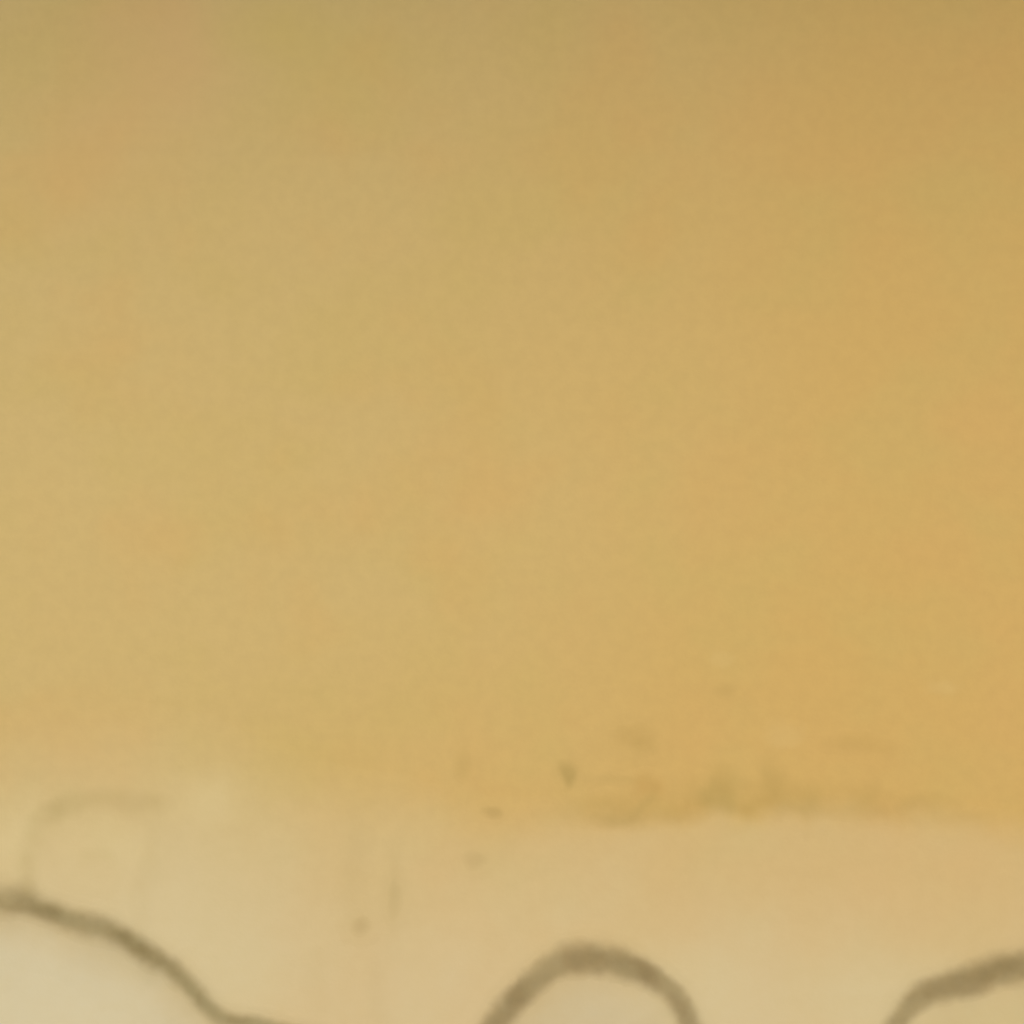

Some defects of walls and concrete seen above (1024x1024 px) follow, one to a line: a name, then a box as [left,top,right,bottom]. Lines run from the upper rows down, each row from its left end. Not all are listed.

leakage [0,697,1024,1024]